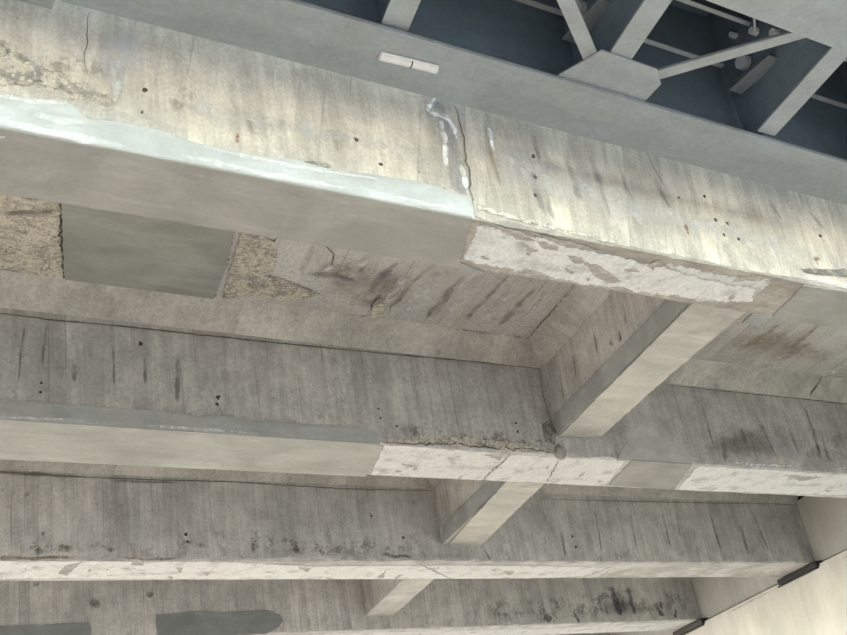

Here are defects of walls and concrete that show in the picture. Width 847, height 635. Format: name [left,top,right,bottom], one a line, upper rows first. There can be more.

crack [452,103,473,201]
spalling [0,193,64,278]
crack [57,204,65,278]
spalling [222,232,319,302]
peeling [464,205,769,304]
peeling [371,420,625,486]
peeling [300,620,693,635]